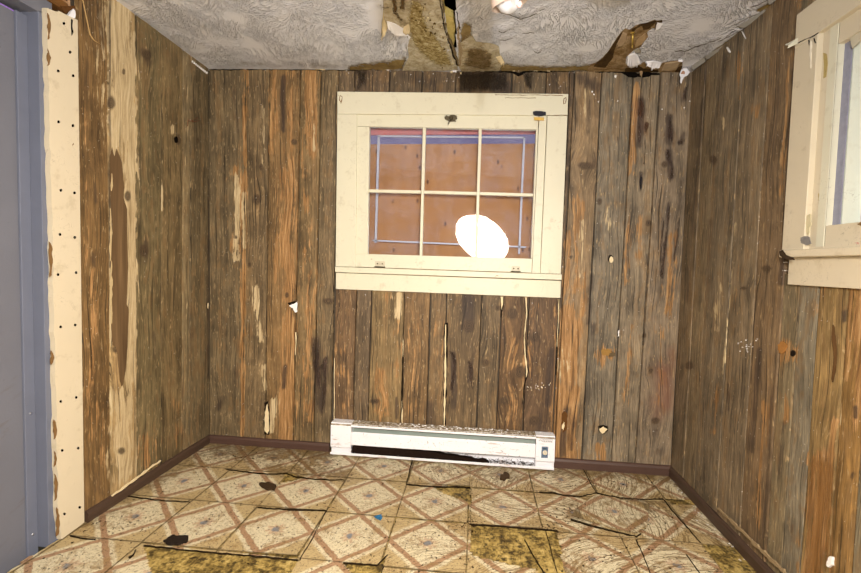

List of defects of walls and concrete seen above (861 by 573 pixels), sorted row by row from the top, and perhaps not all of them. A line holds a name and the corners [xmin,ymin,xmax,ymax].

flaking render [407,0,462,75]
leakage [348,0,589,91]
peeling [587,0,776,73]
peeling [139,543,298,573]
peeling [467,522,565,573]
peeling [665,487,757,573]